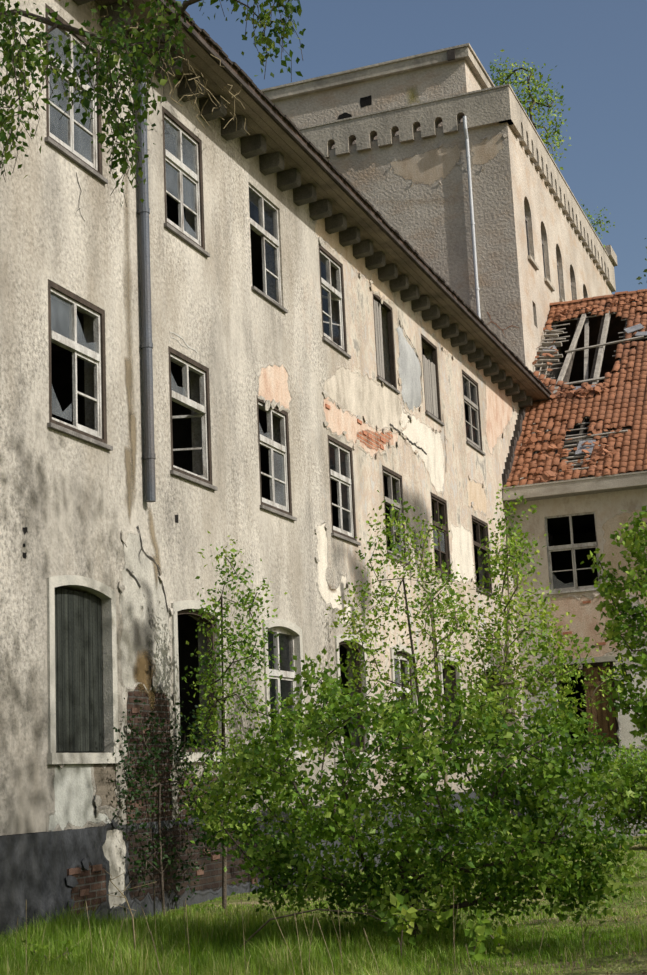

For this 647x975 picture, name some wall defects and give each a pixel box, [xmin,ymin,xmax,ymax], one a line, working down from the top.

spalling [256,361,293,412]
spalling [319,363,445,497]
crack [390,420,448,460]
crack [127,526,169,612]
spalling [315,520,352,630]
spalling [545,506,647,669]
spalling [65,530,273,919]